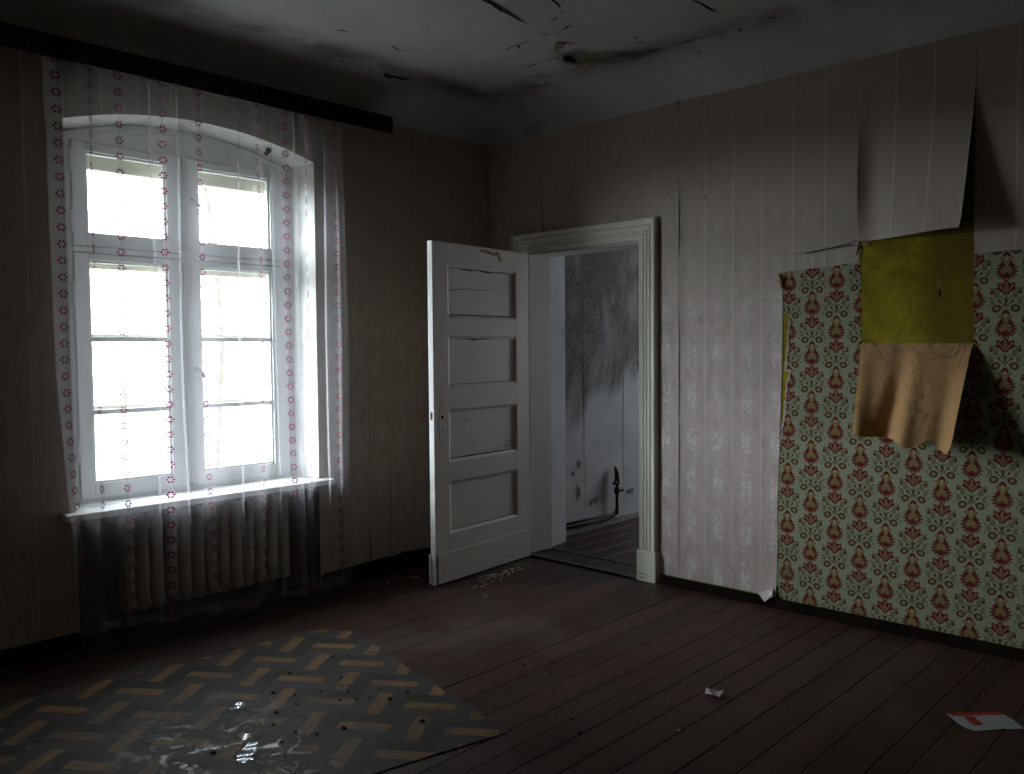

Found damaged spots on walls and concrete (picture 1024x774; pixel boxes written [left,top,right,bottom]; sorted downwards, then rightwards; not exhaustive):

crack [483,0,572,67]
crack [692,0,715,12]
peeling [857,32,977,343]
damp [565,248,639,408]